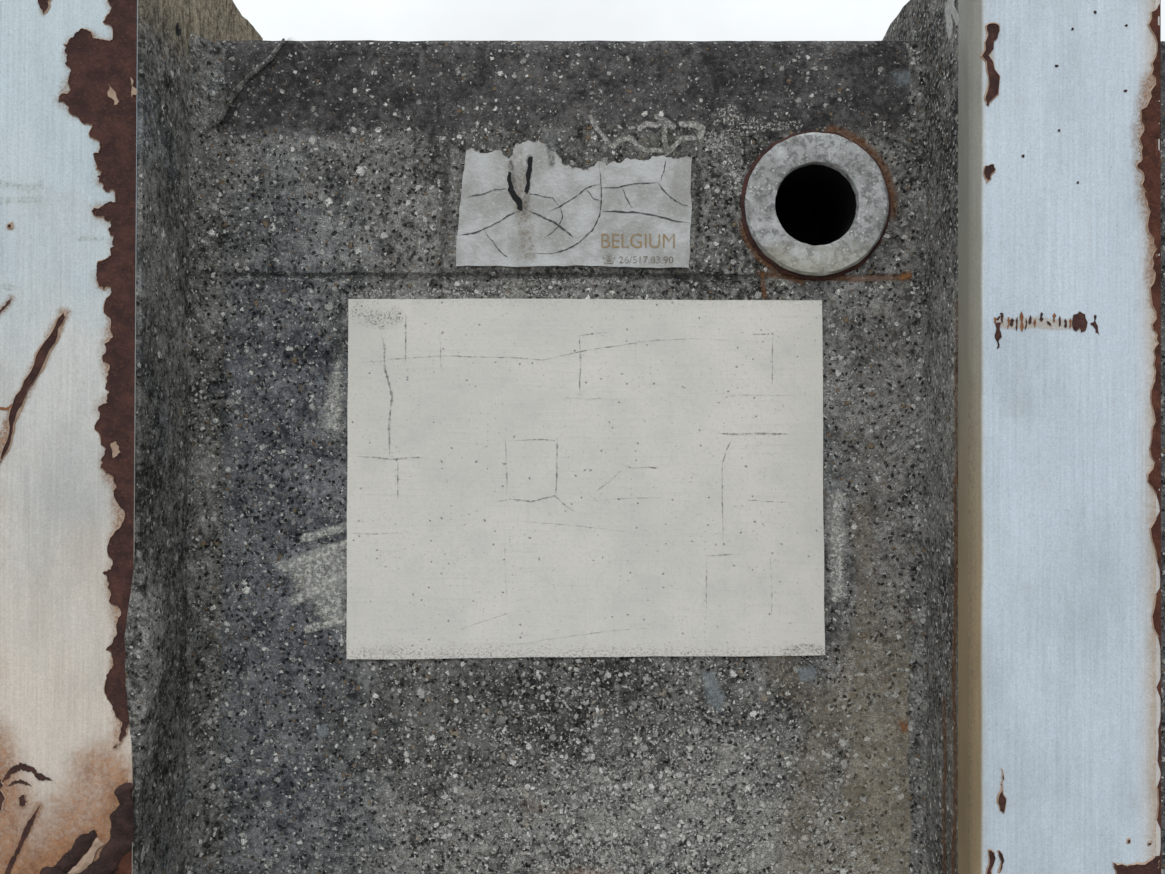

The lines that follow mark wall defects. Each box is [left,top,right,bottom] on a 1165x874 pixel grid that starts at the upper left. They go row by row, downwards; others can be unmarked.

peeling [38,0,52,15]
crack [462,161,689,257]
corrosion [740,127,912,298]
peeling [58,0,137,749]
peeling [0,762,52,812]
corrosion [0,737,130,874]